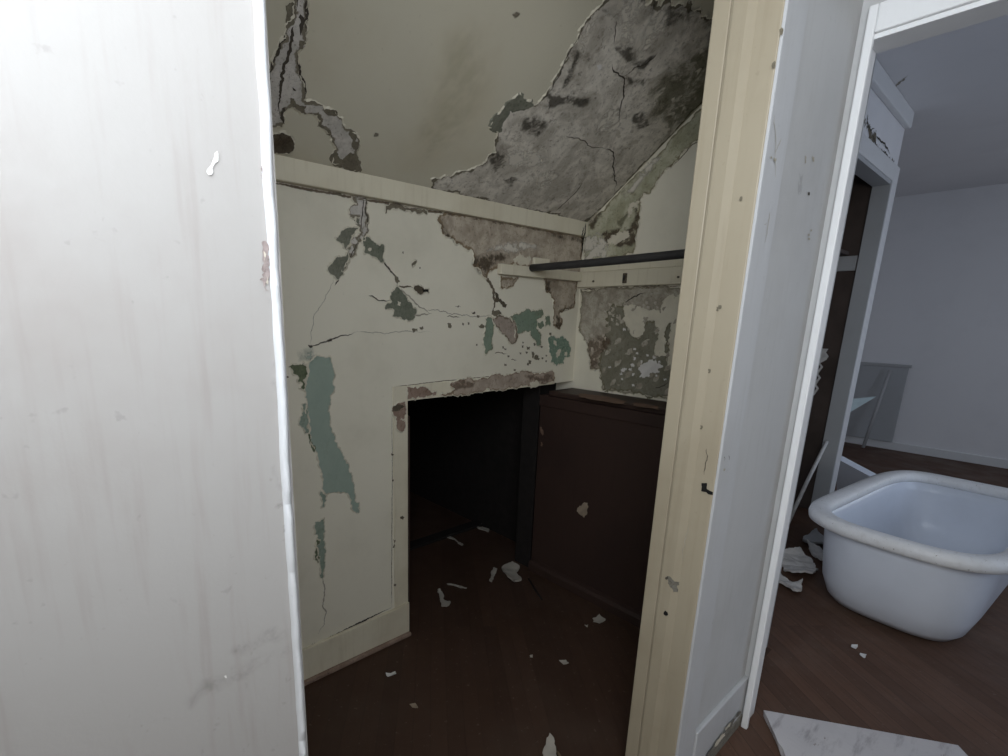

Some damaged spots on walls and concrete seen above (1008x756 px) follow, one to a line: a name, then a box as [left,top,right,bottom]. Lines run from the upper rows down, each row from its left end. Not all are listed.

peeling [269,0,364,172]
crack [308,263,507,348]
spalling [384,0,712,433]
peeling [287,352,360,632]